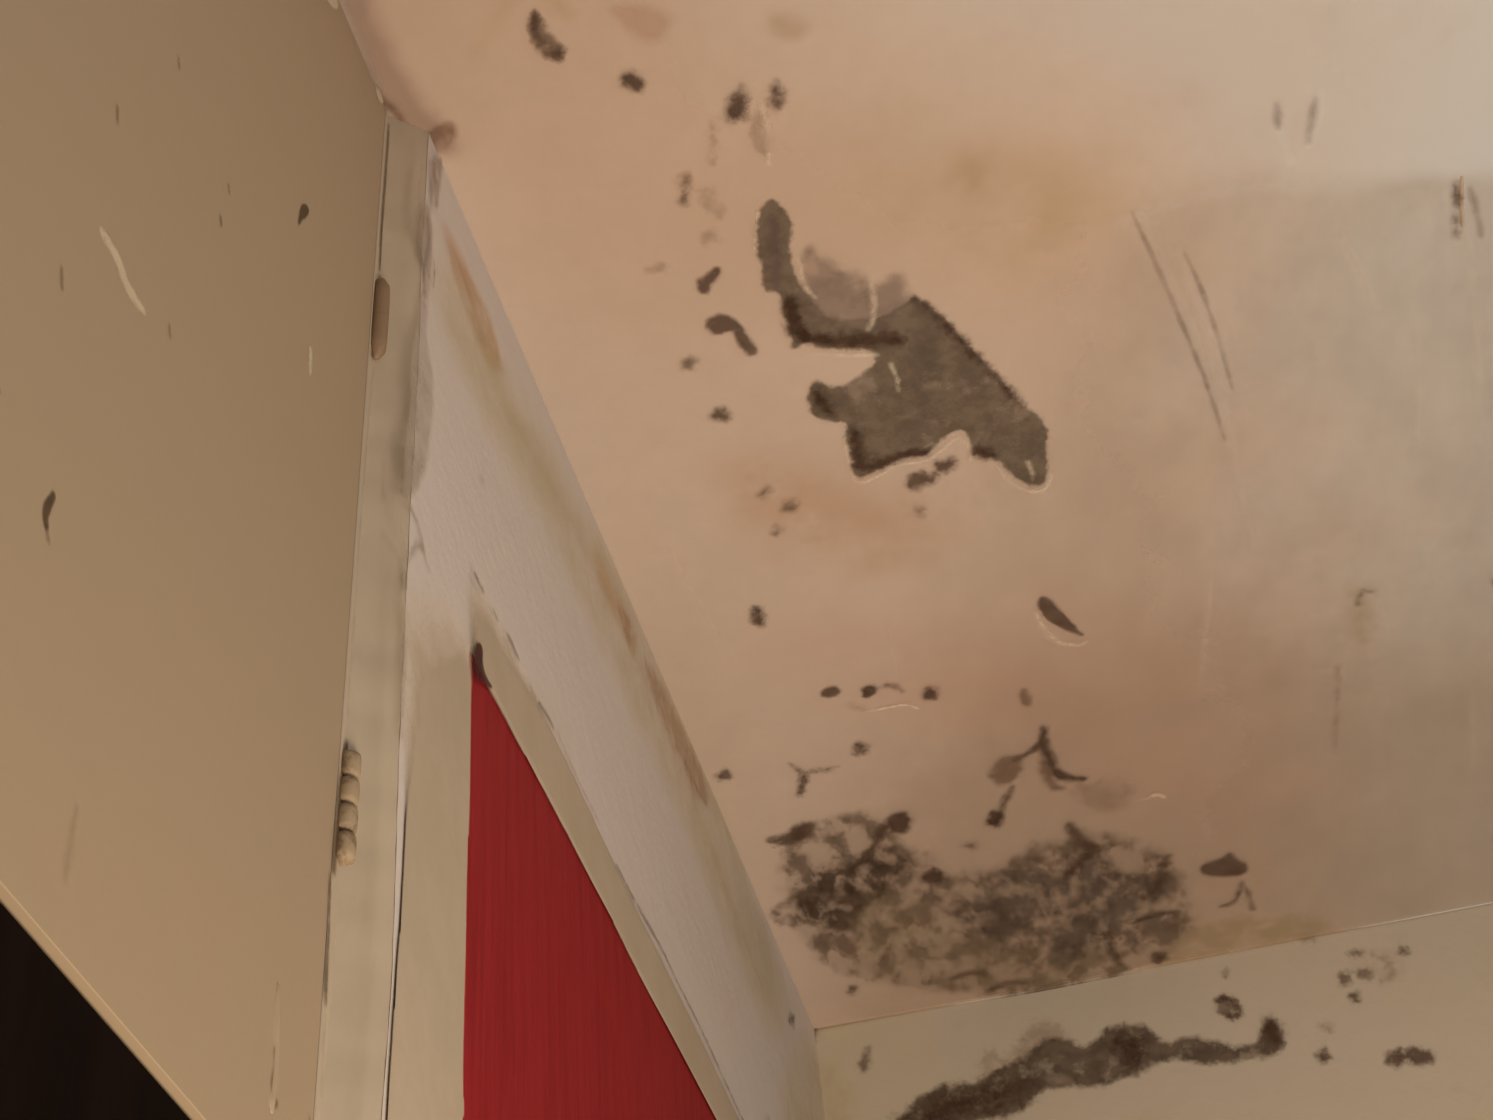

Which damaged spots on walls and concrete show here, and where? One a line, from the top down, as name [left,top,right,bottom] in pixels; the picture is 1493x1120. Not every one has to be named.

leakage [698,268,720,294]
leakage [707,316,756,355]
leakage [1018,728,1086,781]
leakage [987,791,1012,827]
leakage [768,813,1189,995]